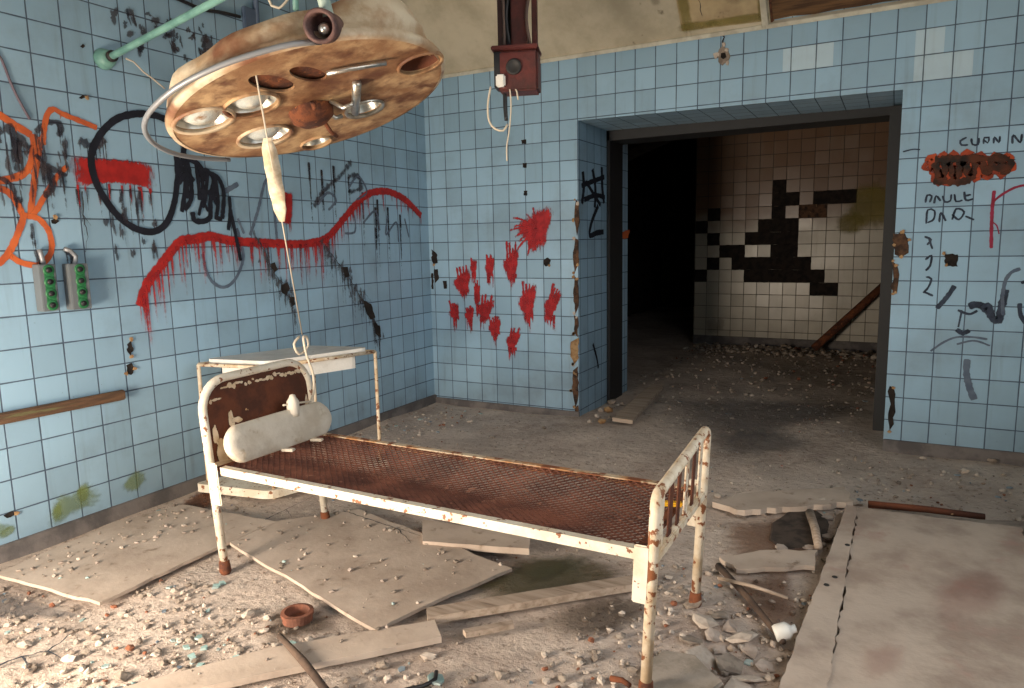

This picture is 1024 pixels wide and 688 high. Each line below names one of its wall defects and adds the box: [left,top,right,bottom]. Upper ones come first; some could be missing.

spalling [713,36,730,66]
spalling [890,229,911,295]
peeling [569,199,580,412]
spalling [769,510,835,550]
damp [483,556,612,596]
crack [0,633,72,671]